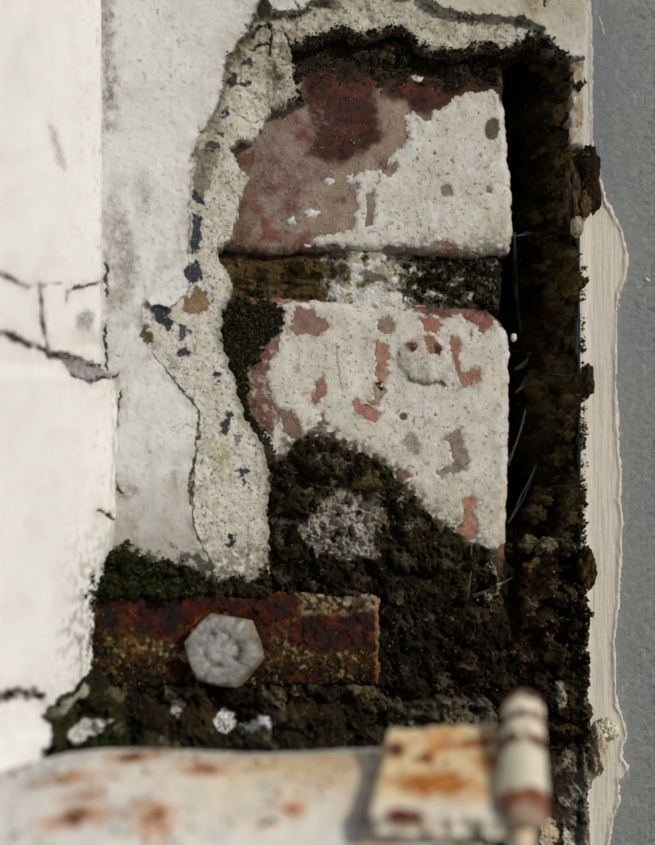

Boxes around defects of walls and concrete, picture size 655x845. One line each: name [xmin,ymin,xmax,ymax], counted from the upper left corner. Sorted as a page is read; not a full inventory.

peeling [139,0,602,584]
crack [0,261,122,427]
leakage [100,389,594,757]
spalling [576,545,598,591]
rust [95,595,378,655]
peeling [170,698,186,717]
peeling [213,706,276,733]
peeling [551,681,567,709]